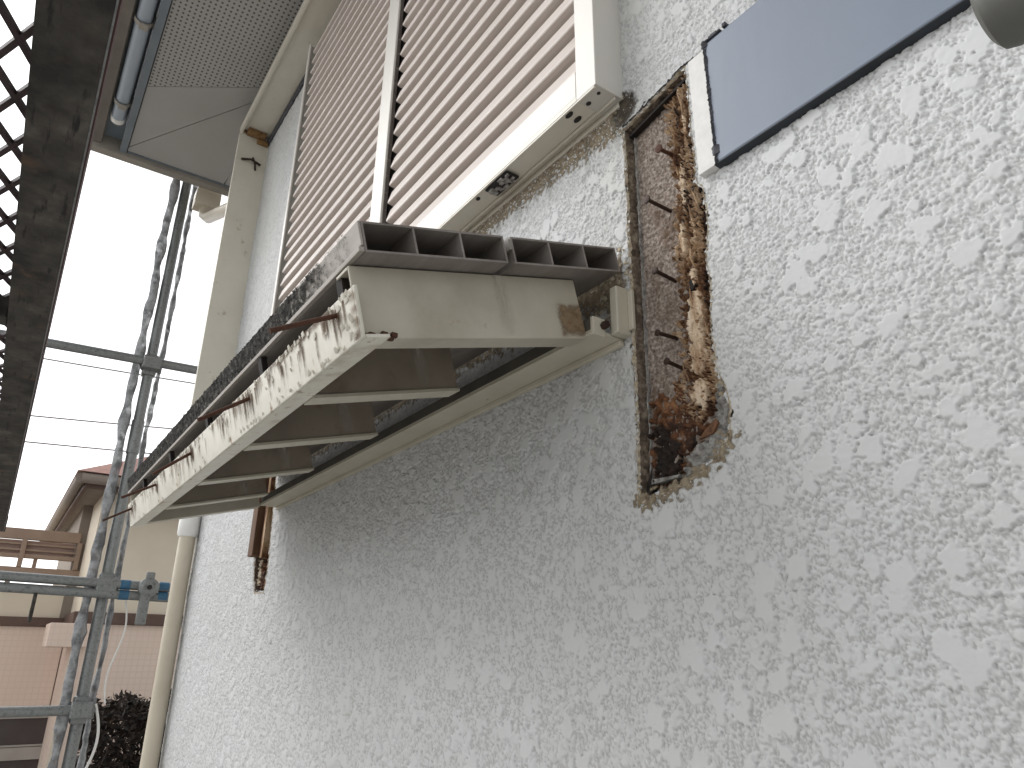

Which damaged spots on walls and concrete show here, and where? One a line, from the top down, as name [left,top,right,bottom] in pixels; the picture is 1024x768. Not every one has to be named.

corrosion [128,291,398,520]
spalling [577,66,734,505]